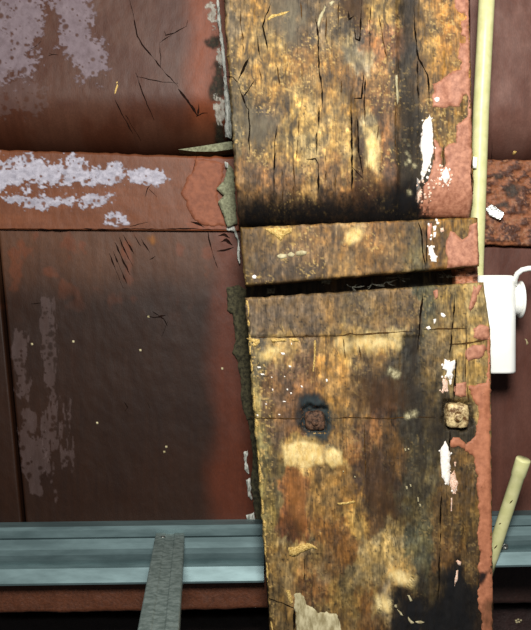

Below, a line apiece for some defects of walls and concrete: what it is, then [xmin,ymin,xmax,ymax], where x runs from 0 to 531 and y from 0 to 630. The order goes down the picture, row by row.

peeling [0,0,109,86]
peeling [0,152,167,211]
peeling [104,212,129,227]
crack [110,222,154,283]
crack [130,2,203,119]
crack [226,4,271,153]
crack [273,0,387,207]
crack [414,14,430,105]
peeling [417,0,479,268]
peeling [442,324,493,630]